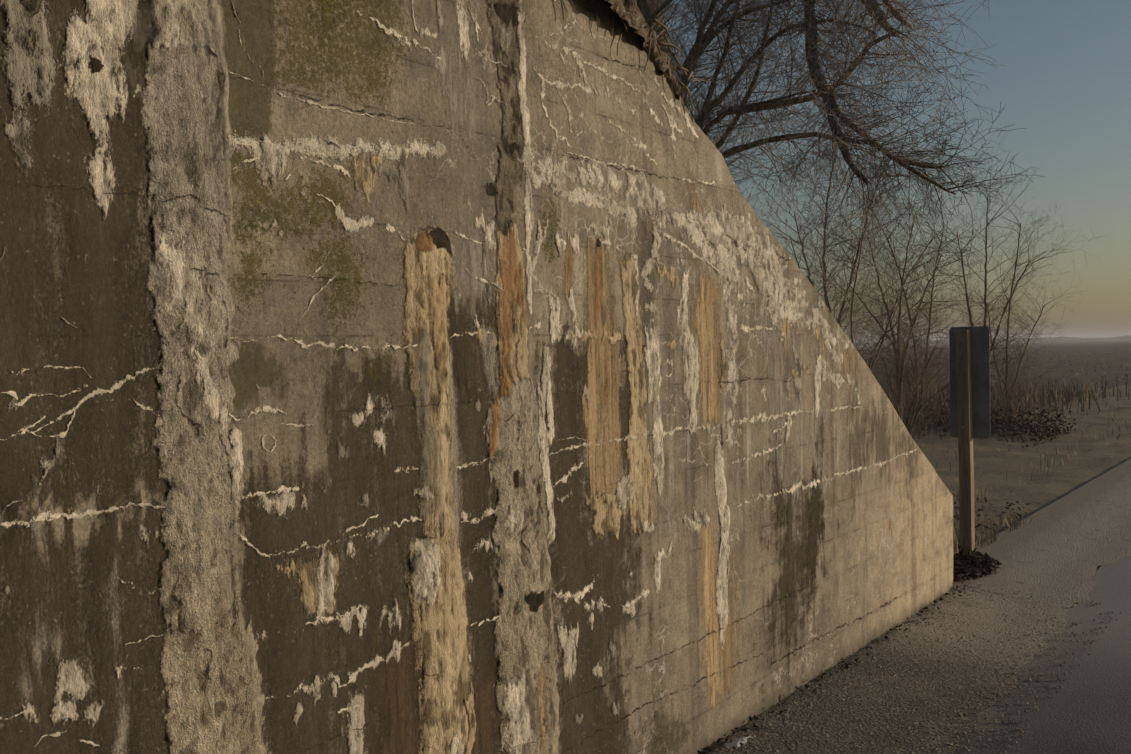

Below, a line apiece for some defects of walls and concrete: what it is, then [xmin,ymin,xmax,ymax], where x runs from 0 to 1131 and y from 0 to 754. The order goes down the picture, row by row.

damp [228,130,447,240]
crack [0,365,160,440]
crack [0,501,170,536]
damp [0,0,175,754]
crack [227,251,418,351]
damp [237,345,444,754]
damp [446,199,509,754]
corrosion [563,234,624,496]
crack [548,377,861,544]
corrosion [692,257,724,433]
damp [517,143,918,754]
corrosion [696,509,741,710]